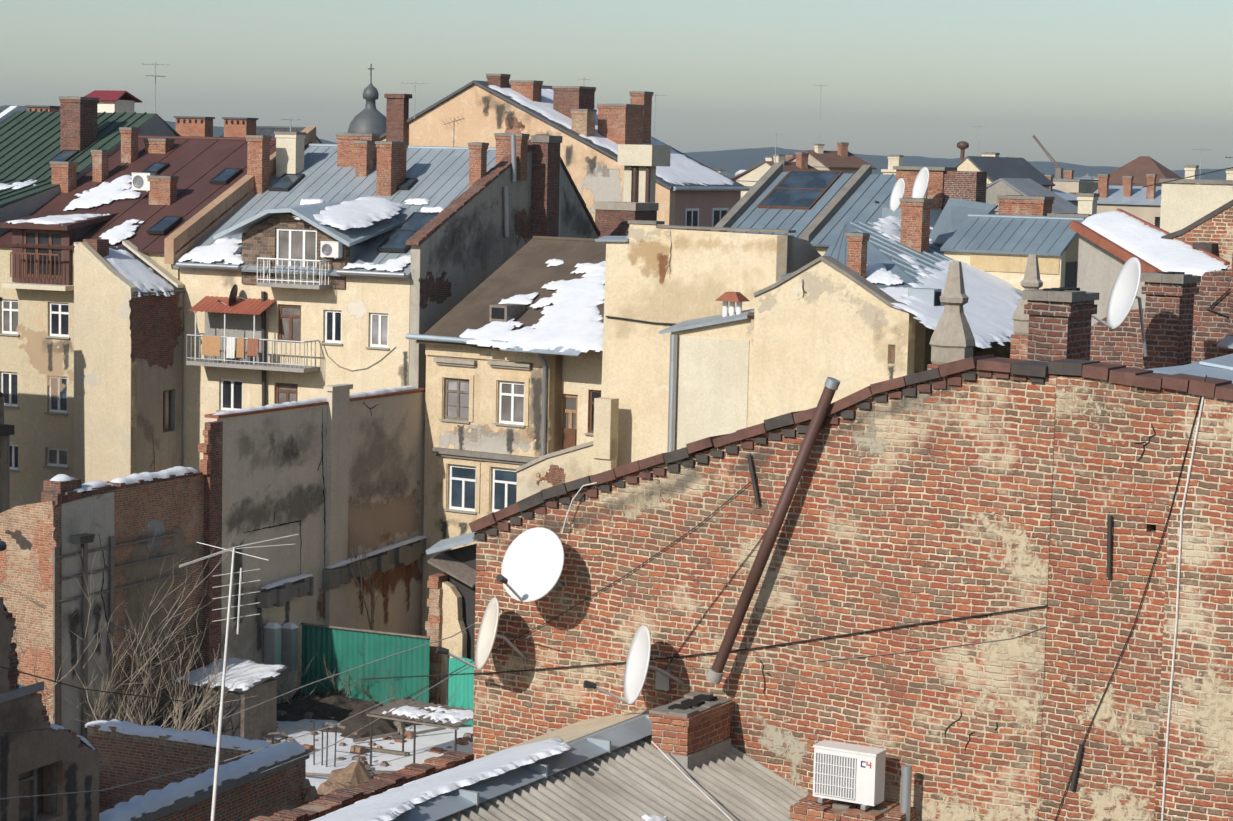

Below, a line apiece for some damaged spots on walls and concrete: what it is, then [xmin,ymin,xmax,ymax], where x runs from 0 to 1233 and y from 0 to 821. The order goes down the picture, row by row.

flaking render [418,271,452,309]
flaking render [129,288,184,369]
crack [1135,424,1156,461]
flaking render [0,509,56,595]
corrosion [317,590,325,618]
corrosion [355,560,421,623]
flaking render [0,597,98,752]